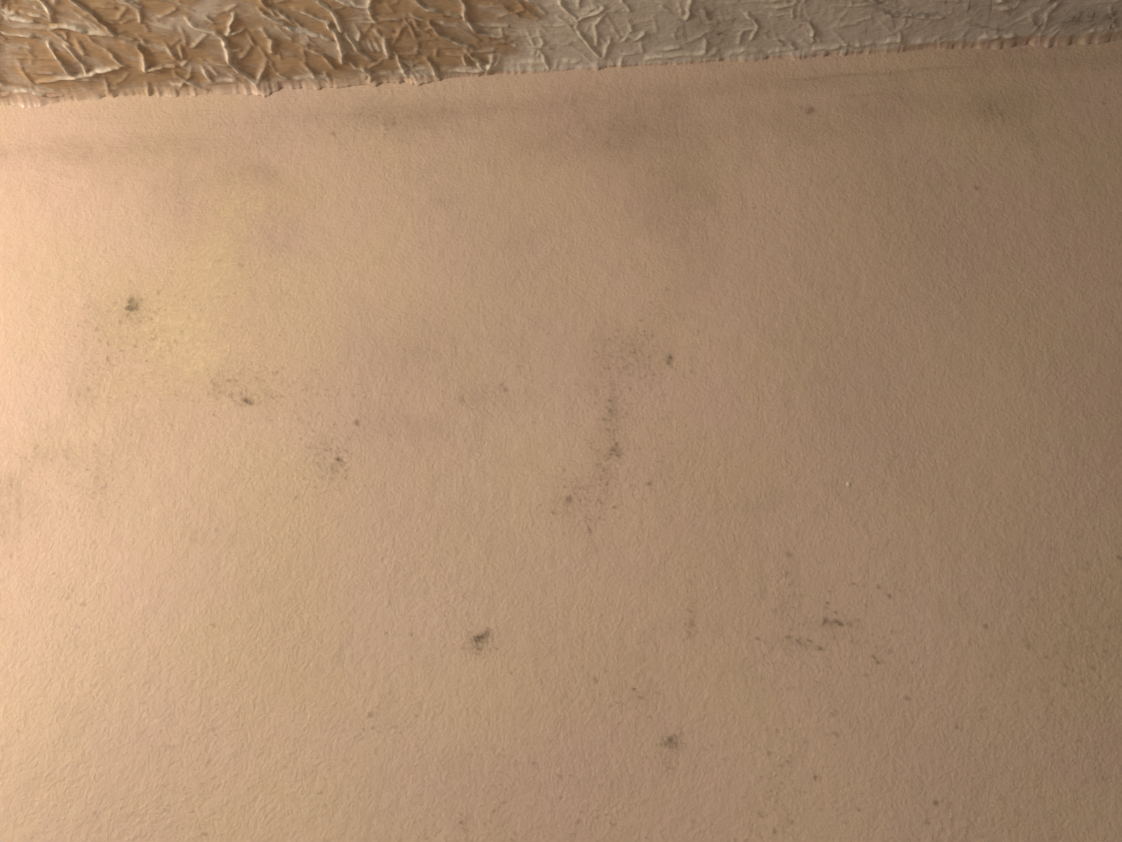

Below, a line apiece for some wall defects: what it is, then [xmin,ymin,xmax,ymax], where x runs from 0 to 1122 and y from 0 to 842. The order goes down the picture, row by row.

damp [0,0,536,91]